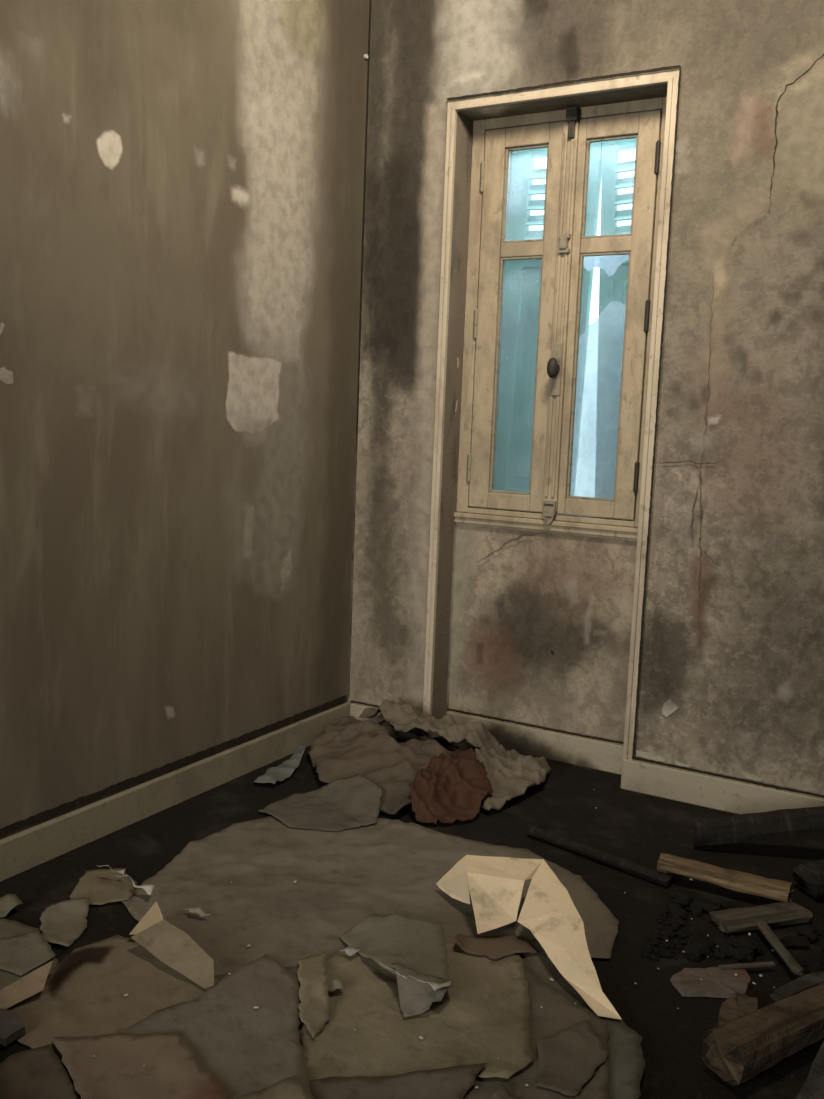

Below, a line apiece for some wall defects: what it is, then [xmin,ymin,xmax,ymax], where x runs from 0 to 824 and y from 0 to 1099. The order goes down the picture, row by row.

flaking render [97,131,122,169]
damp [226,0,317,433]
peeling [0,367,14,385]
crack [447,54,824,798]
damp [500,588,591,664]